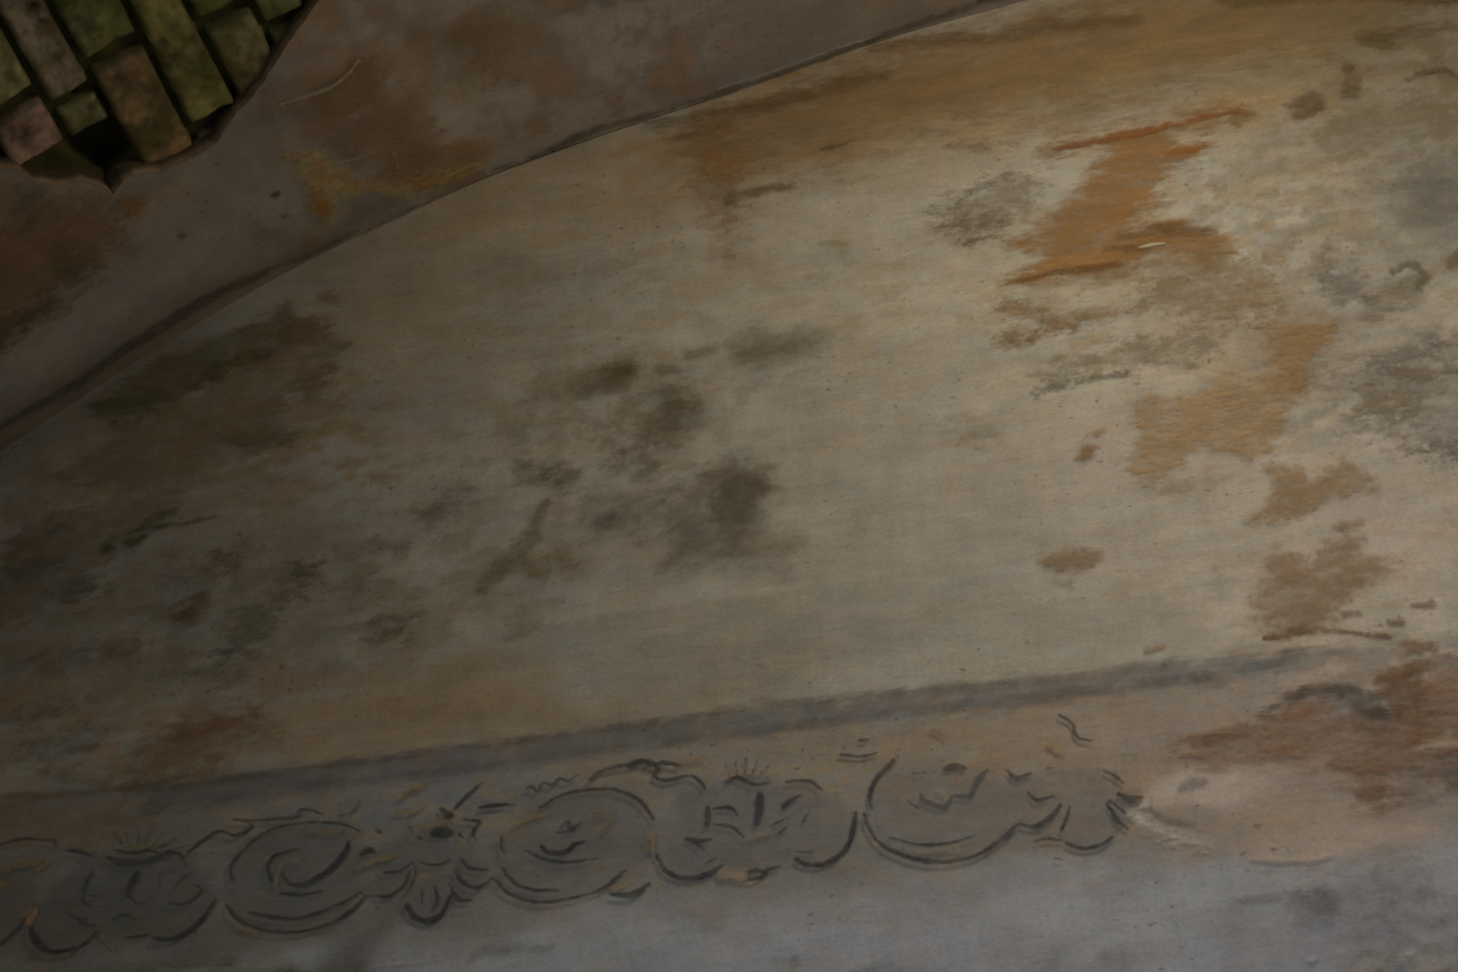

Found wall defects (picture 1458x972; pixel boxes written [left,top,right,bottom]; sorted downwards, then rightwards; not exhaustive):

spalling [0,0,319,195]